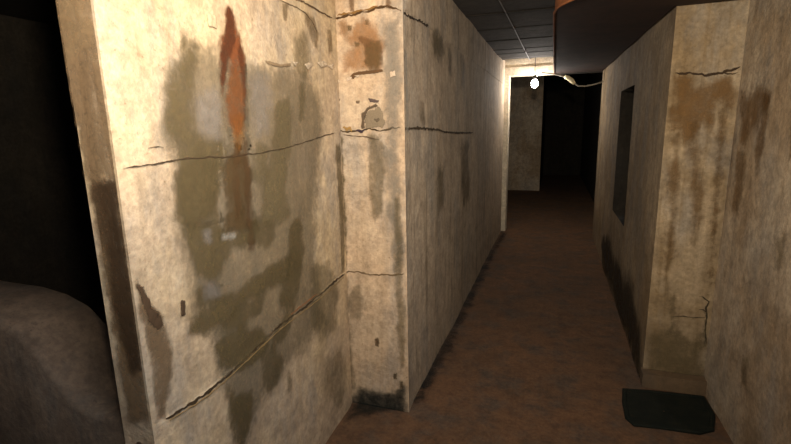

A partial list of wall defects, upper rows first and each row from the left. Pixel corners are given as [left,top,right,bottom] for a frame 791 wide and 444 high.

crack [281,0,428,31]
corrosion [347,21,383,70]
crack [677,67,740,77]
corrosion [219,6,251,226]
spalling [356,98,385,129]
crack [127,126,473,168]
damp [336,138,347,271]
damp [164,41,323,444]
damp [416,232,504,399]
crack [166,271,403,421]
damp [349,388,405,418]